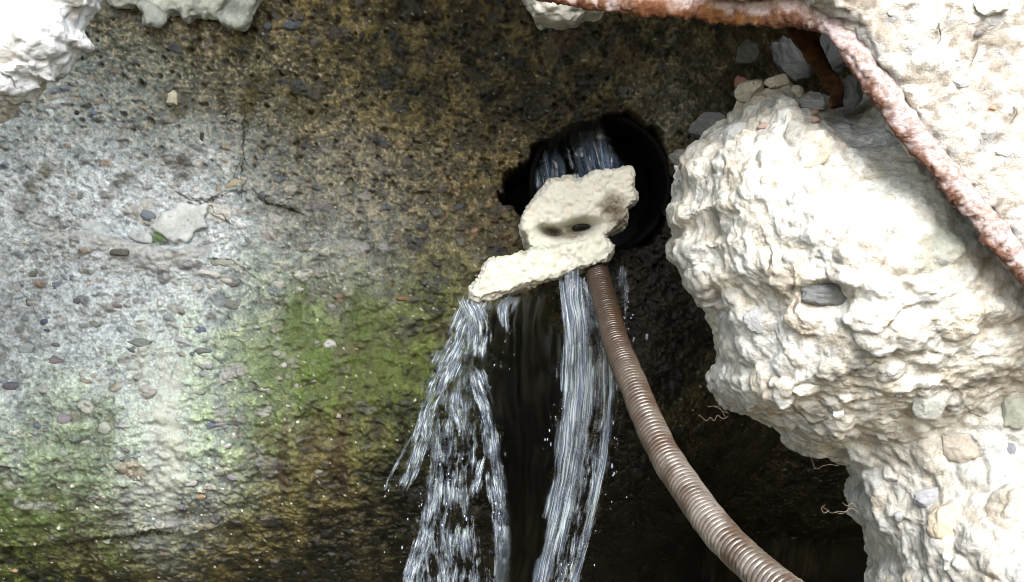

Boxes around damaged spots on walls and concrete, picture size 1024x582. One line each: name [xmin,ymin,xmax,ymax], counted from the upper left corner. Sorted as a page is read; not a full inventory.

crack [192,105,299,224]
efflorescence [155,378,185,494]